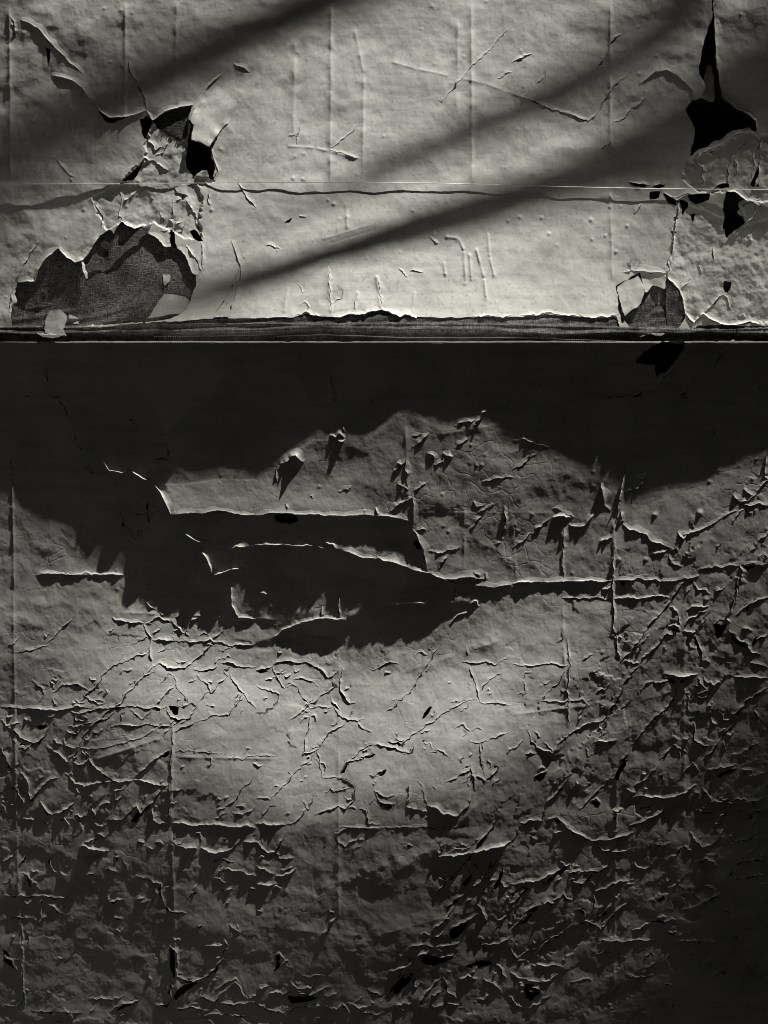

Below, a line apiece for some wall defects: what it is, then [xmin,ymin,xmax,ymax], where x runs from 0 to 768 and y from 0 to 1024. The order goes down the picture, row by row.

crack [234,62,250,72]
crack [438,29,645,149]
spalling [629,0,764,238]
peeling [92,138,169,229]
peeling [160,85,236,275]
peeling [38,309,79,338]
crack [265,214,307,249]
crack [299,266,343,313]
crack [399,267,423,277]
peeling [617,272,666,316]
crack [1,432,768,1022]
peeling [1,714,501,903]